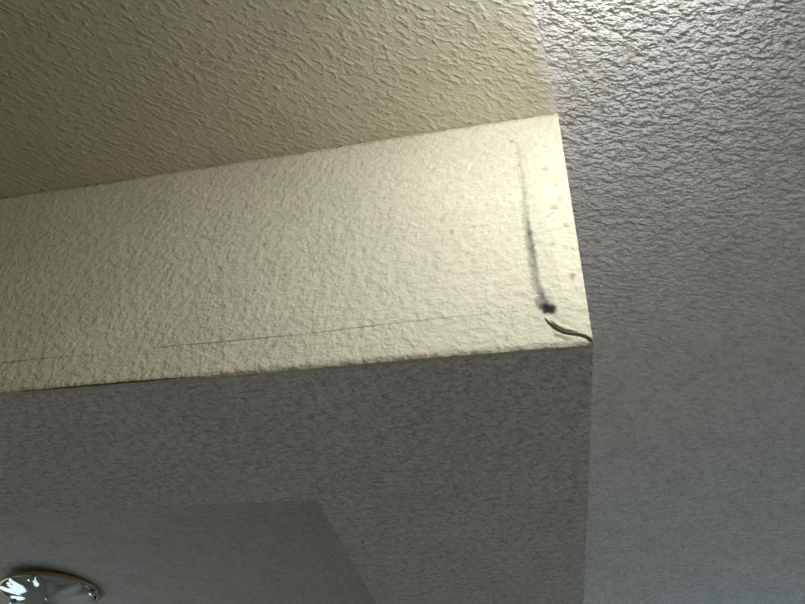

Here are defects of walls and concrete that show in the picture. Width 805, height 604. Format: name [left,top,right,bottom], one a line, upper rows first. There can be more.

crack [545,318,593,342]